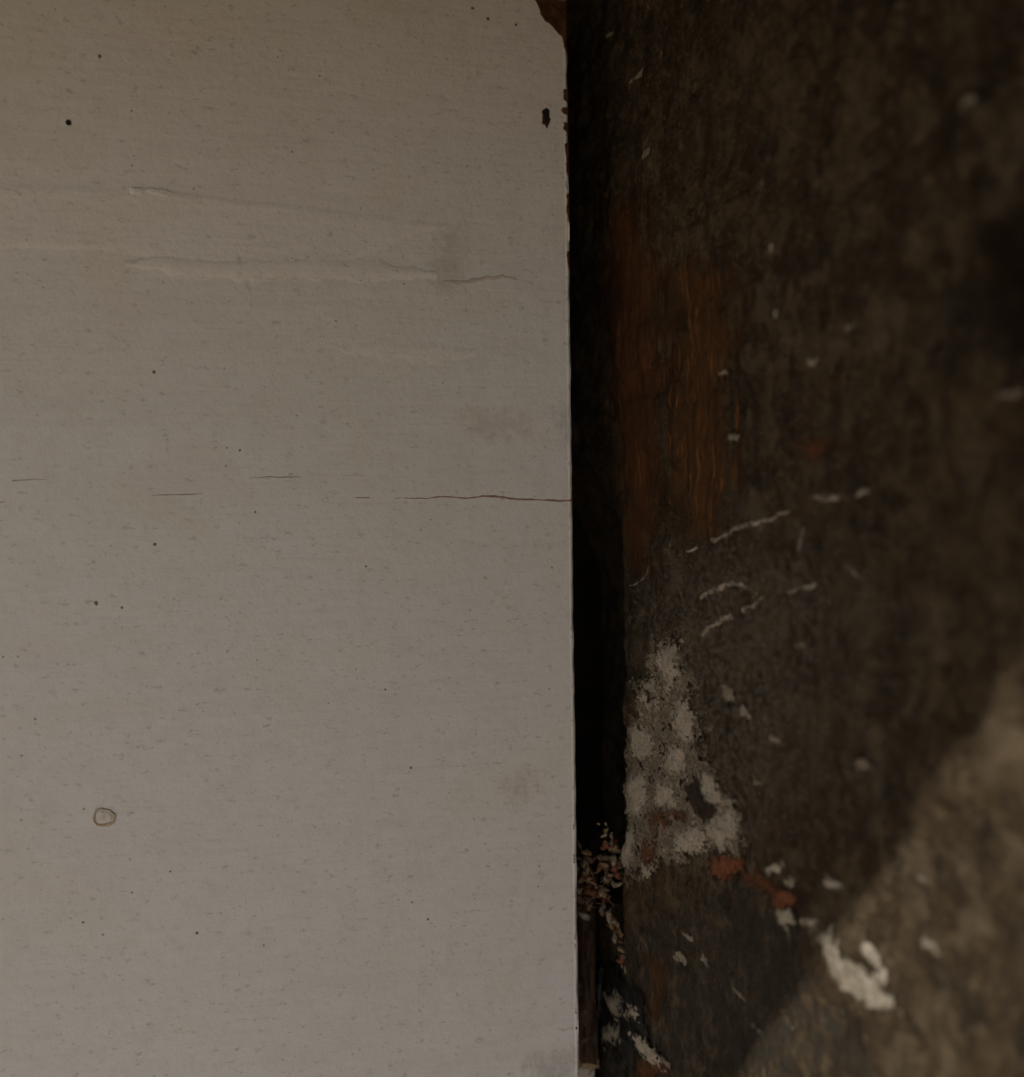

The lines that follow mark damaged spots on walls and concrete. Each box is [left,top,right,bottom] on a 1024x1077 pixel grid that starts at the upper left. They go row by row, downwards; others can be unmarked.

peeling [536,0,567,54]
crack [395,494,573,502]
leakage [625,502,928,861]
leakage [624,867,876,1077]